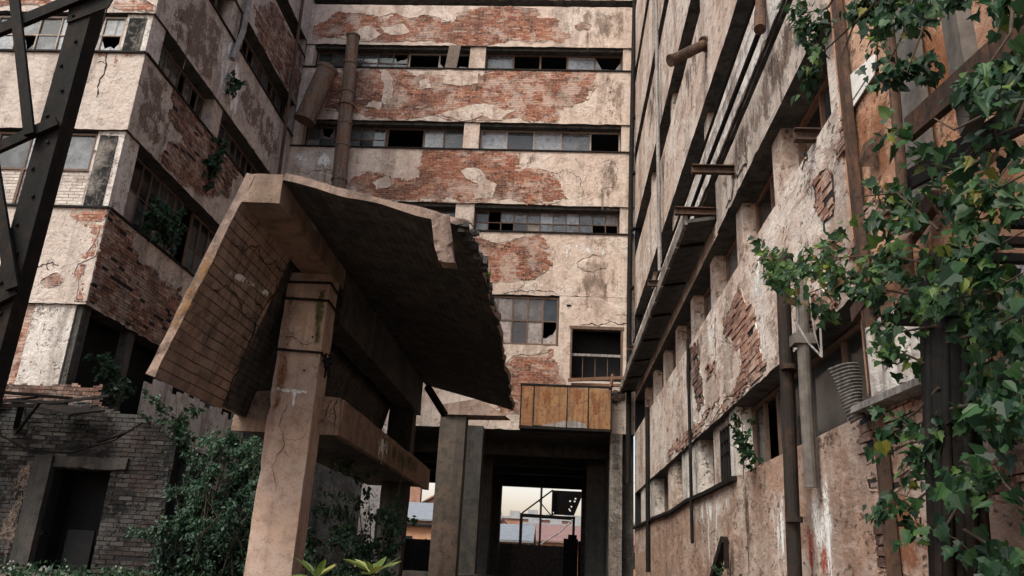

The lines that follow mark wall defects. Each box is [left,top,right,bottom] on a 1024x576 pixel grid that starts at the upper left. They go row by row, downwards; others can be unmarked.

peeling [324,68,597,123]